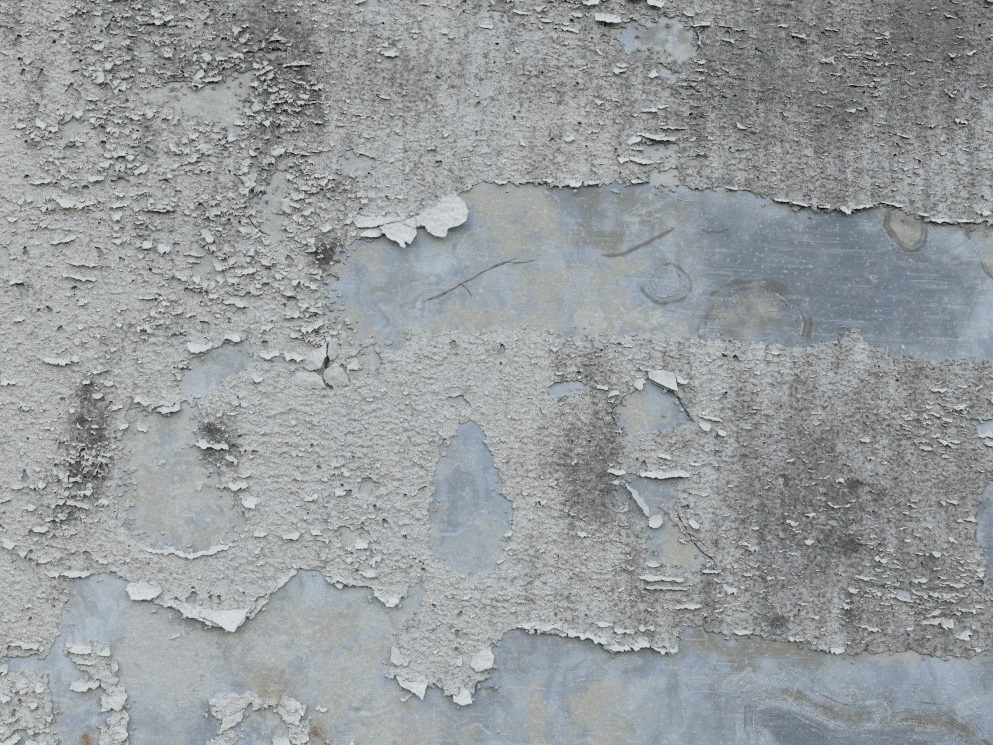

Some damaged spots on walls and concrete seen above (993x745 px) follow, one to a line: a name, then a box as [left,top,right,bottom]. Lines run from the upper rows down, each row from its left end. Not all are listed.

peeling [512,0,747,78]
peeling [821,52,879,75]
peeling [56,196,98,210]
peeling [242,169,303,247]
peeling [284,125,993,373]
peeling [222,297,248,308]
peeling [64,323,306,560]
peeling [597,369,726,437]
peeling [0,481,89,533]
peeling [424,420,514,579]
peeling [607,453,722,590]
peeling [0,538,993,745]